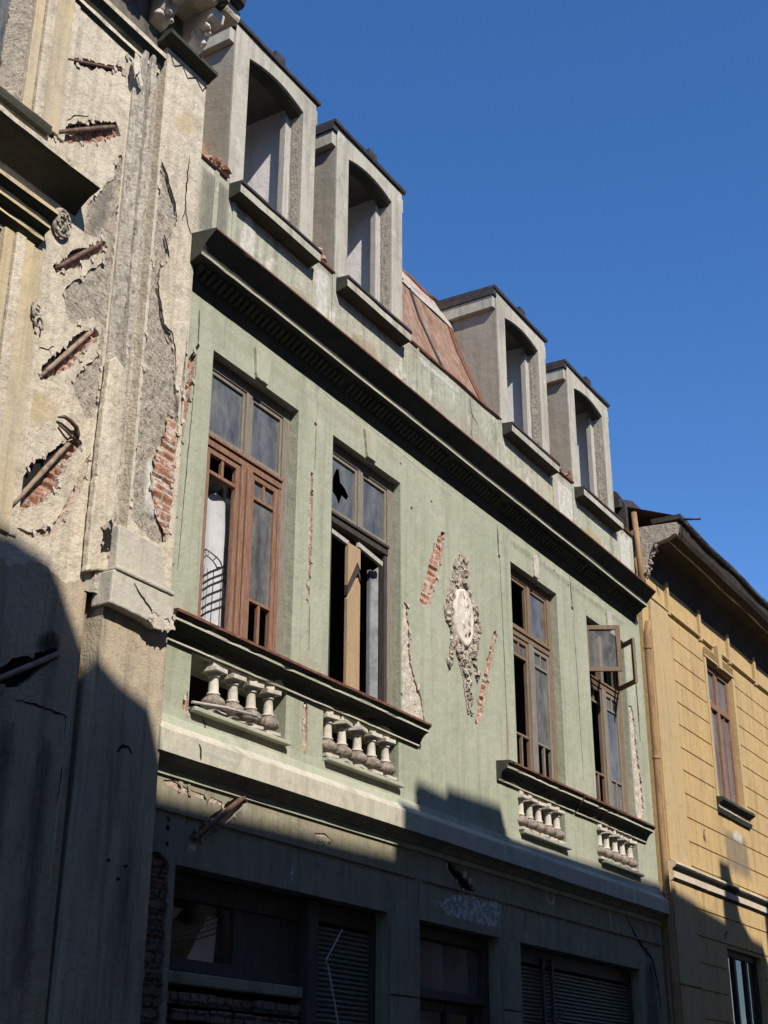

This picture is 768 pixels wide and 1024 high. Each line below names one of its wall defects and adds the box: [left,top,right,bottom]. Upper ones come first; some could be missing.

flaking render [74,52,143,90]
spalling [50,118,117,146]
spalling [38,156,121,419]
spalling [129,164,197,565]
spalling [17,430,92,538]
flaking render [401,533,474,720]
flaking render [450,622,498,725]
flaking render [628,706,645,819]